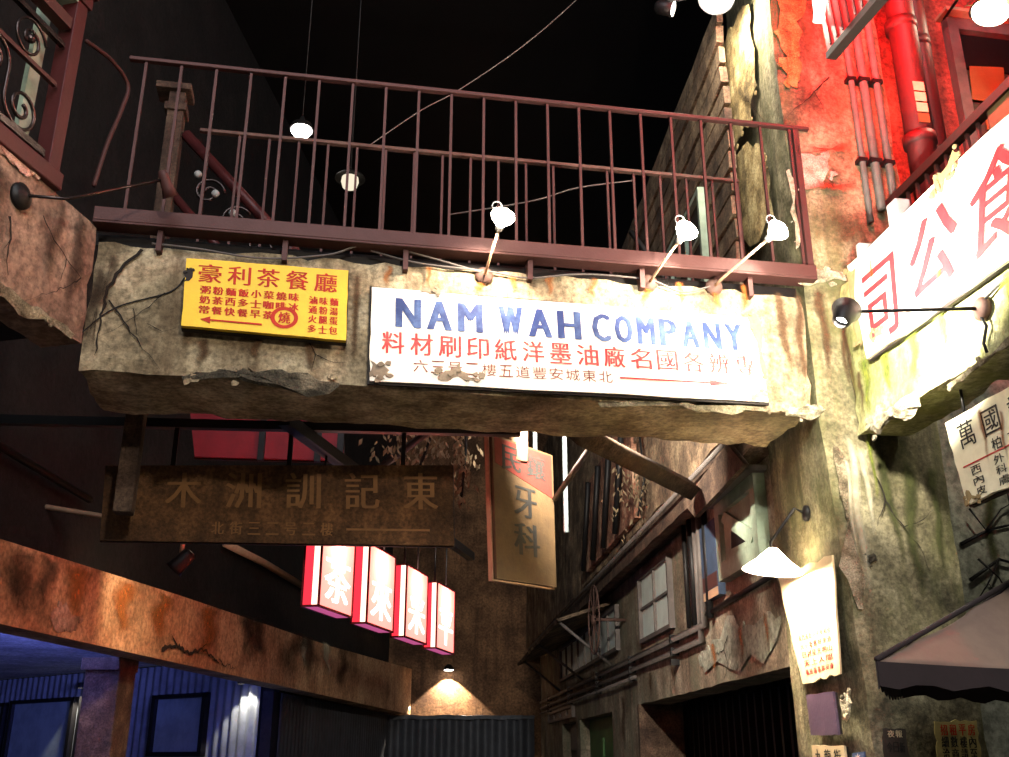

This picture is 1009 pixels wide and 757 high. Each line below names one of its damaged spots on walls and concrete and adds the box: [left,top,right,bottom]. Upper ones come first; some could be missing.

peeling [773,0,806,88]
crack [94,249,174,365]
leakage [881,352,889,386]
leakage [907,334,917,372]
spalling [598,388,825,422]
spalling [865,391,921,441]
leakage [845,434,923,586]
leakage [927,468,942,556]
crack [162,634,235,669]